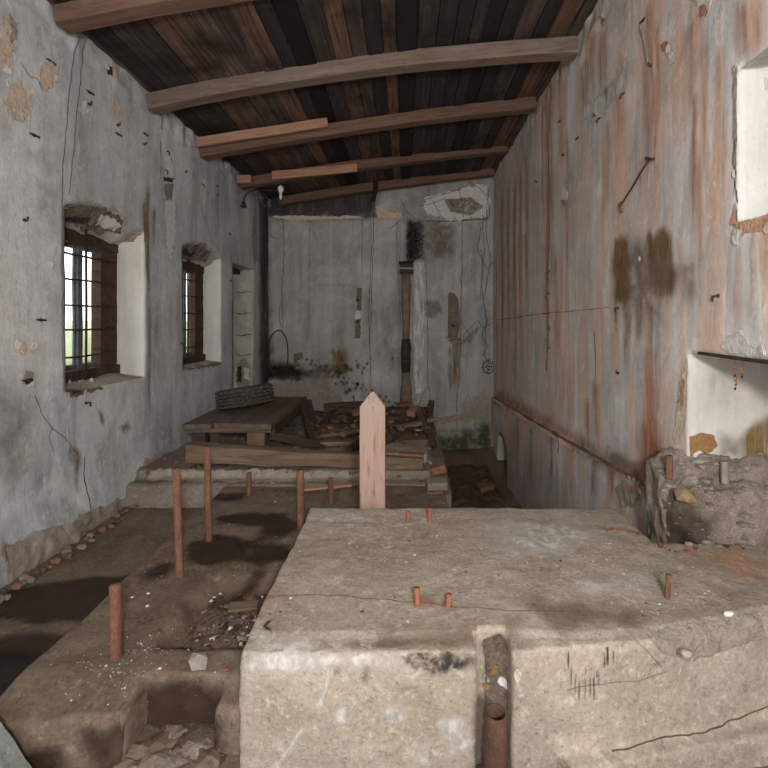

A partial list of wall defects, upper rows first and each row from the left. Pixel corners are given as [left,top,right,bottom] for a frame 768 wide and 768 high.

spalling [0,13,59,122]
peeling [424,183,491,222]
corrosion [693,111,705,177]
peeling [730,63,768,246]
damp [614,229,674,325]
crack [35,395,92,510]
damp [306,351,396,404]
corrosion [563,355,657,495]